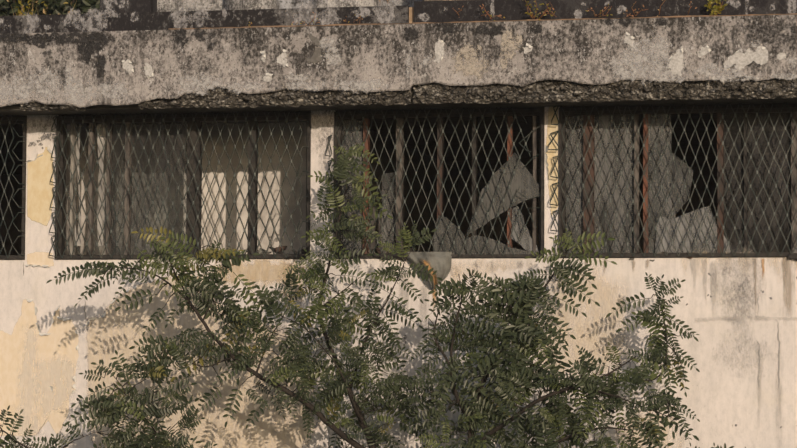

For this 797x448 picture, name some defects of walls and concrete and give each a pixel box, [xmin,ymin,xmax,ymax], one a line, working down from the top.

mould [0,31,115,81]
mould [172,26,218,51]
spalling [138,27,797,216]
peeling [26,146,54,226]
peeling [25,252,54,268]
damp [783,257,797,307]
peeling [0,275,313,448]